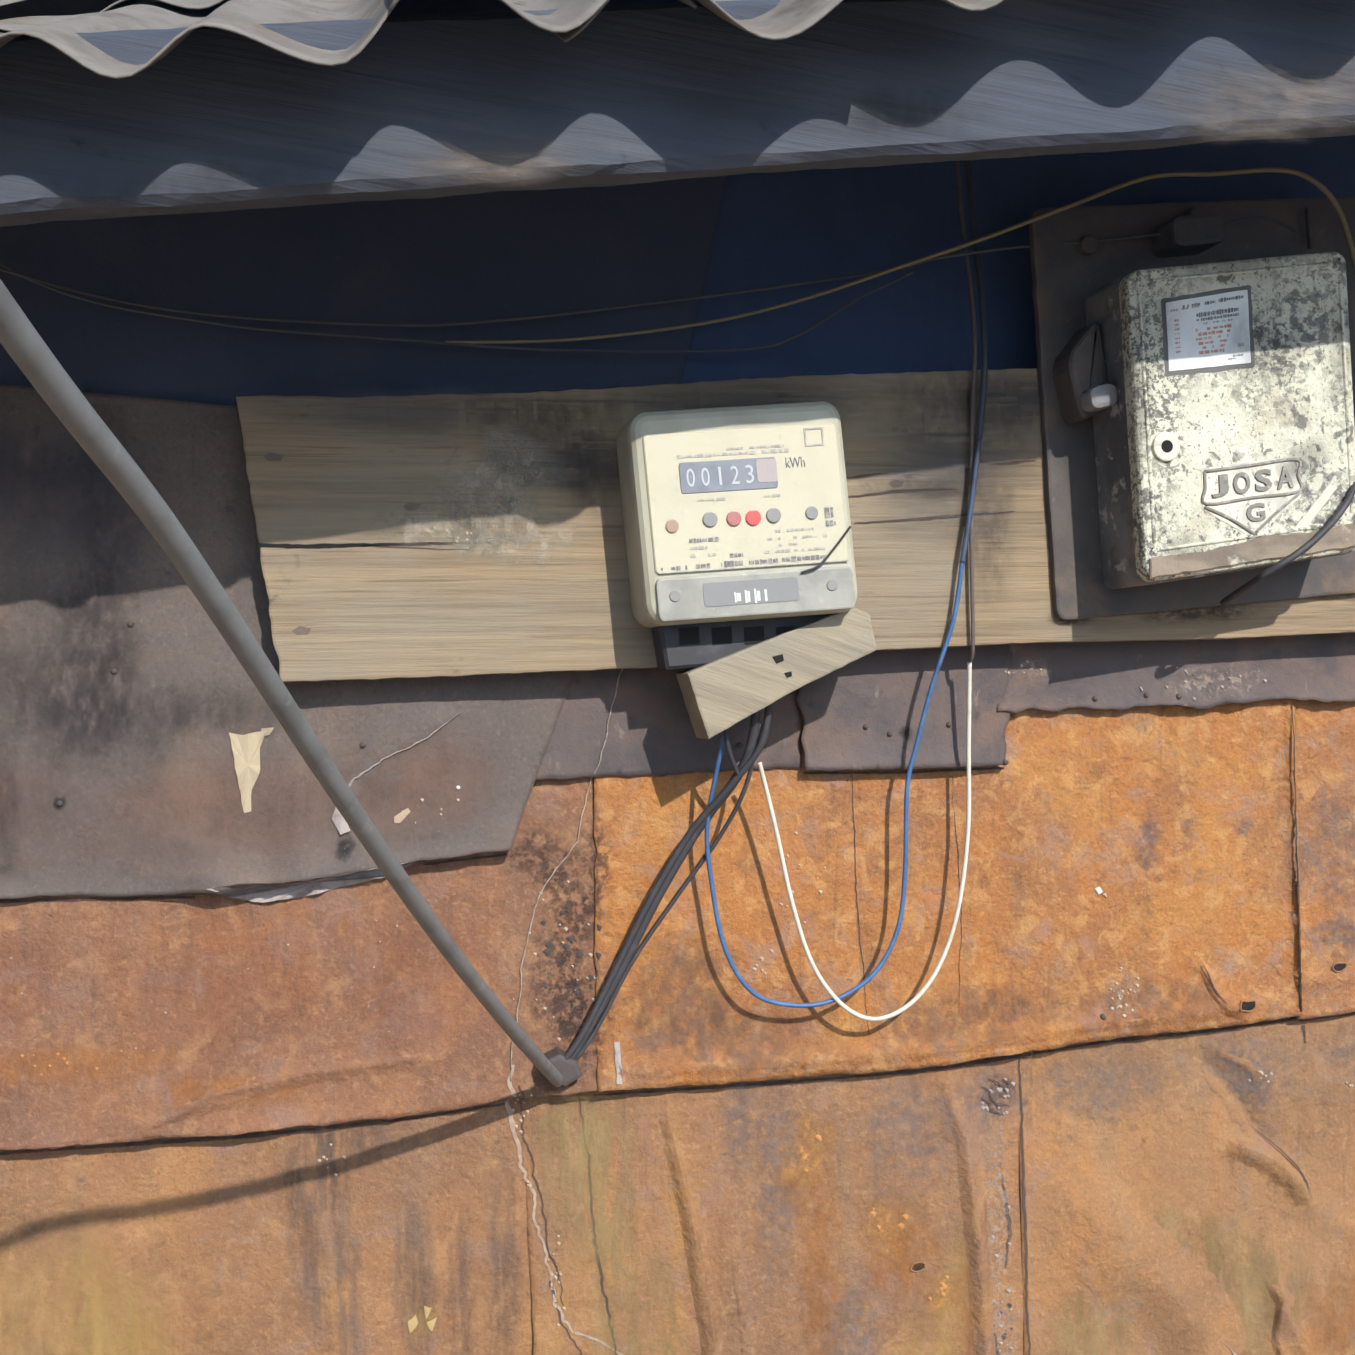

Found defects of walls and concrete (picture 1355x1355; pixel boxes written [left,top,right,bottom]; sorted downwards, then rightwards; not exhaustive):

crack [258,542,493,550]
rust [423,853,508,865]
rust [529,905,602,1027]
rust [593,703,1355,1355]
rust [0,1103,505,1155]
crack [505,1065,624,1355]